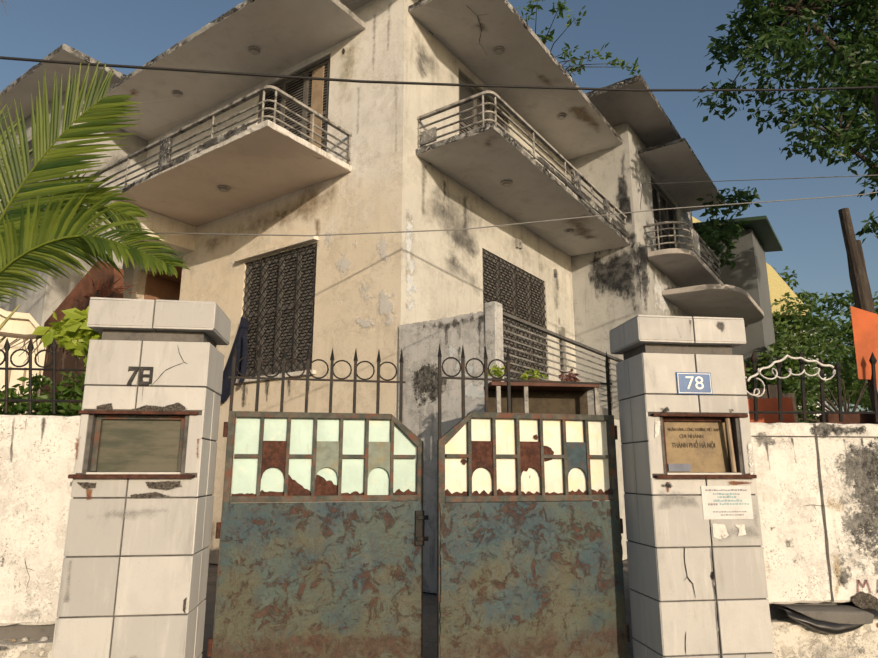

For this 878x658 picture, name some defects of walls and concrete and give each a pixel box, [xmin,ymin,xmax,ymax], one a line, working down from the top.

leakage [437,182,475,252]
leakage [590,160,650,310]
leakage [412,364,447,412]
leakage [810,422,878,587]
crack [684,527,721,658]